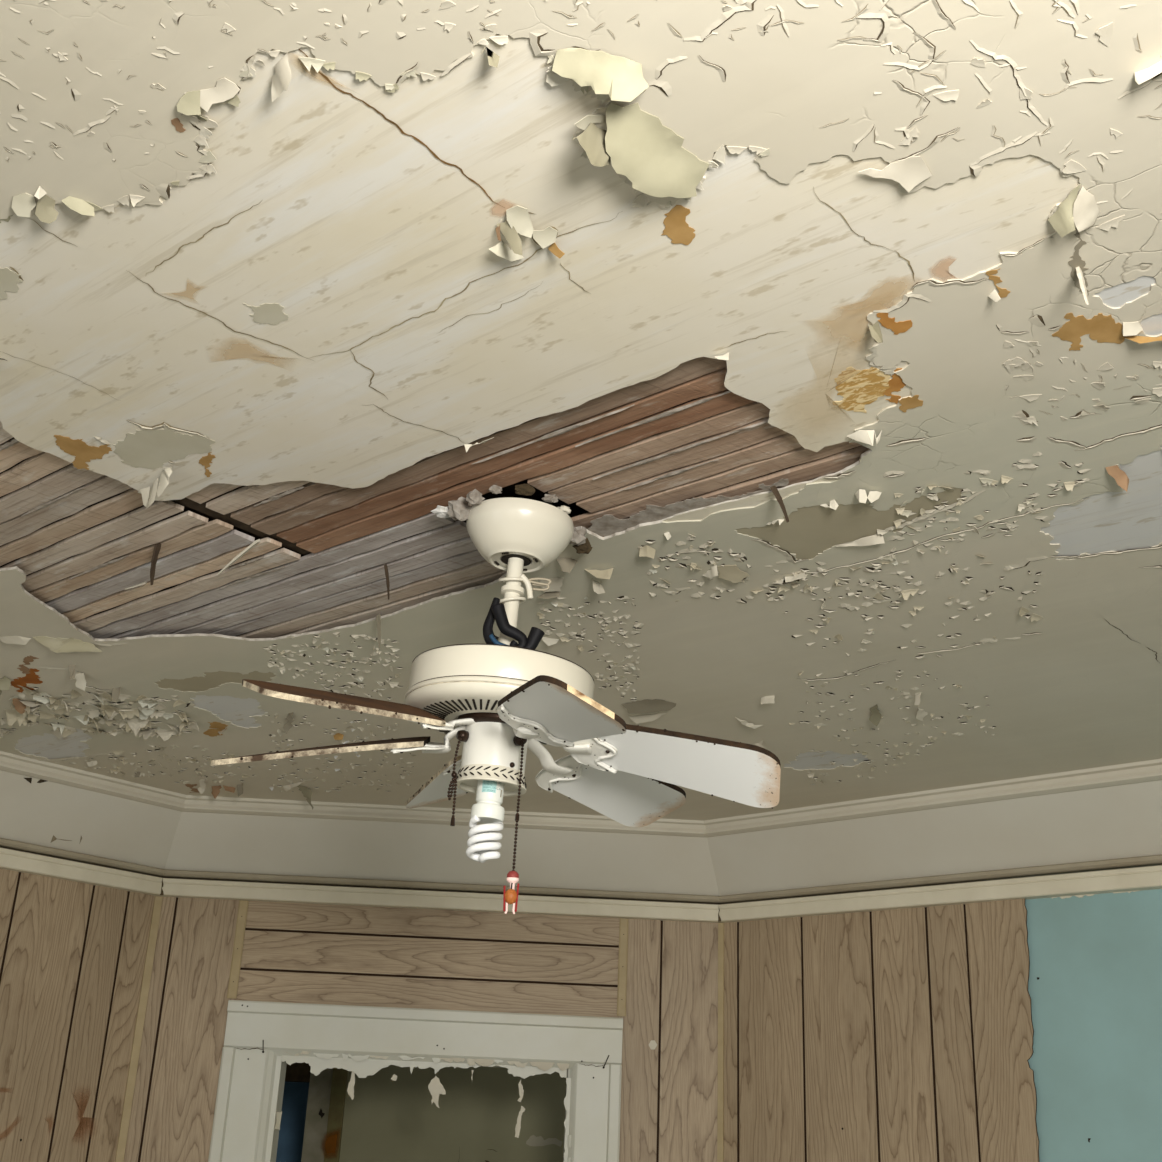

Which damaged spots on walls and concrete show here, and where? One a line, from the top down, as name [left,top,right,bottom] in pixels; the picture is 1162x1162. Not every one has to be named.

crack [396,31,474,88]
crack [529,29,602,56]
crack [641,0,774,97]
crack [852,0,1049,177]
crack [1060,59,1113,91]
crack [126,49,623,444]
flaking render [0,0,1162,509]
crack [814,192,1054,313]
flaking render [0,632,417,810]
flaking render [537,558,676,724]
peeling [587,446,1162,785]
peeling [282,1051,571,1162]